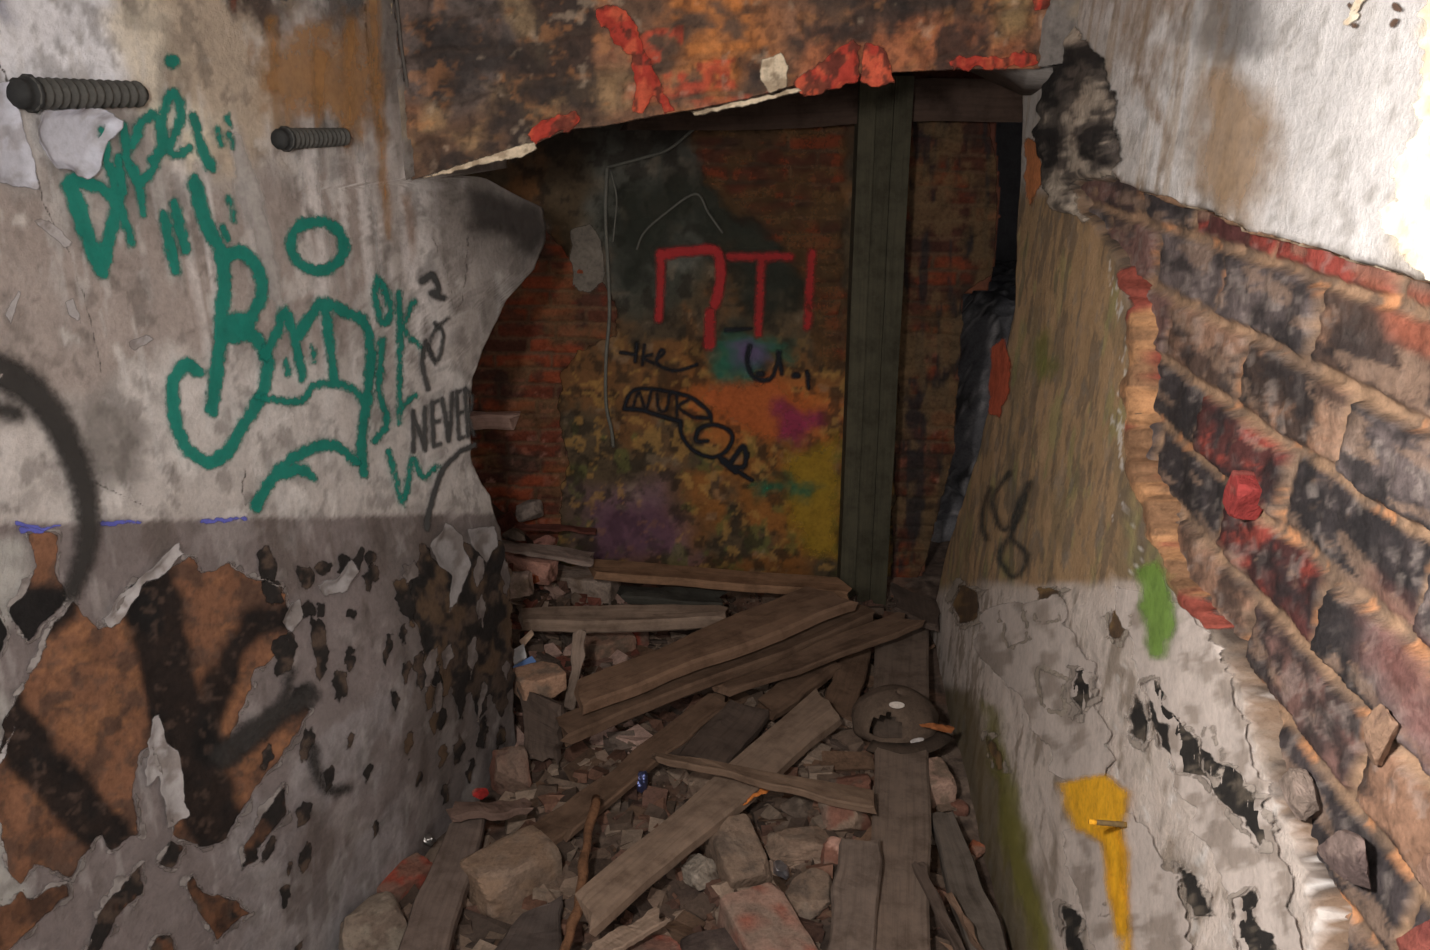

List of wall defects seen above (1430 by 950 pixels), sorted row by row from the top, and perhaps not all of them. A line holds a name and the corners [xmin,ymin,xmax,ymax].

damp [228,0,296,36]
peeling [0,82,123,190]
damp [233,134,286,328]
spalling [391,0,1430,950]
peeling [0,224,618,950]